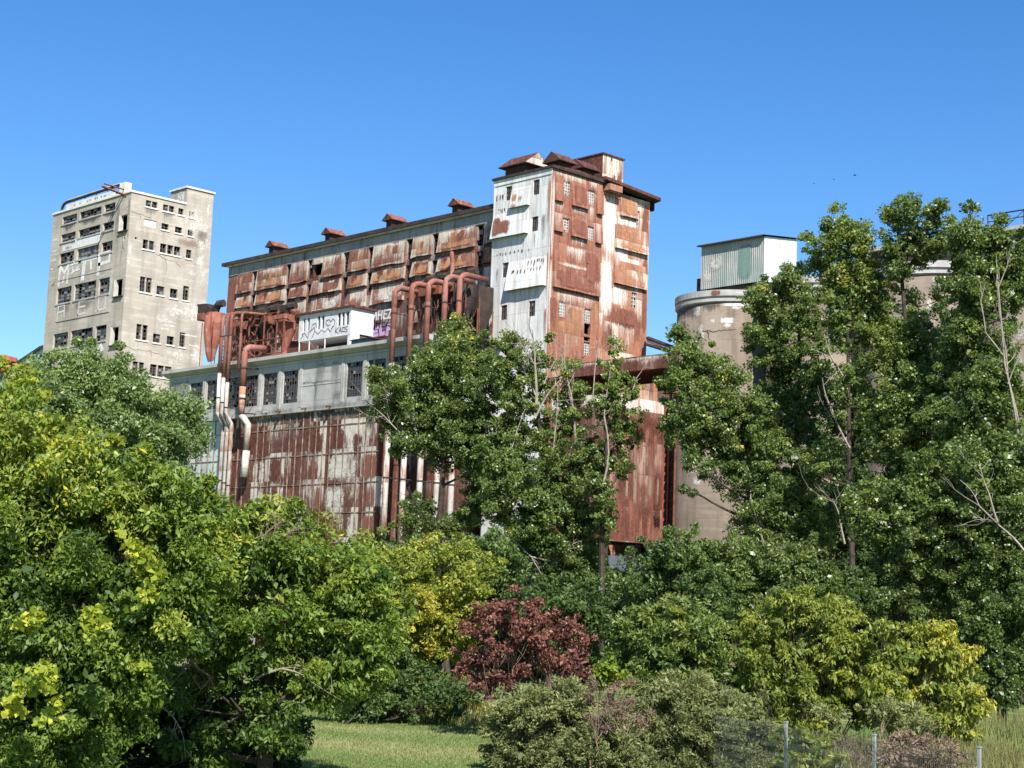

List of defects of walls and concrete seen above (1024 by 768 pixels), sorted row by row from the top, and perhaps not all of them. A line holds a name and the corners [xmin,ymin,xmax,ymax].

rust [323,230,469,290]
rust [485,194,649,351]
rust [243,434,292,512]
rust [303,427,411,546]
rust [612,409,661,542]